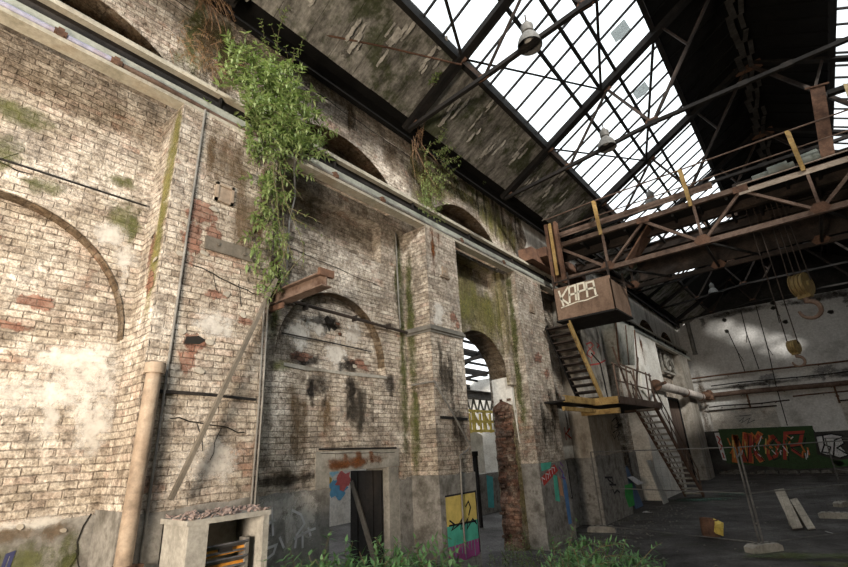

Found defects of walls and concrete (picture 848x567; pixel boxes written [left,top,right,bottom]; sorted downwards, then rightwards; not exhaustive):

spalling [176,199,222,266]
spalling [178,328,214,374]
damp [23,348,114,449]
damp [346,386,374,431]